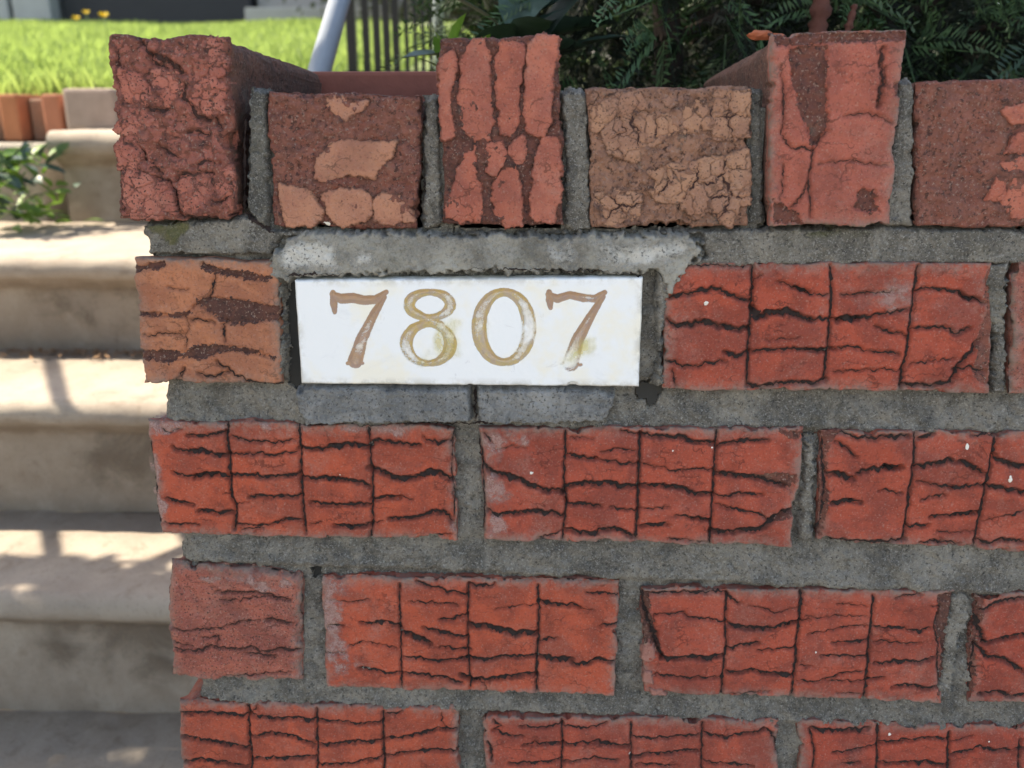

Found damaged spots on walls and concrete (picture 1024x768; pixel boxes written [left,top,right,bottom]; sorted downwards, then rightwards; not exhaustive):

spalling [109,35,243,221]
spalling [270,92,423,229]
spalling [436,32,565,230]
crack [596,98,748,219]
crack [779,67,886,217]
crack [847,49,886,121]
spalling [911,81,1024,227]